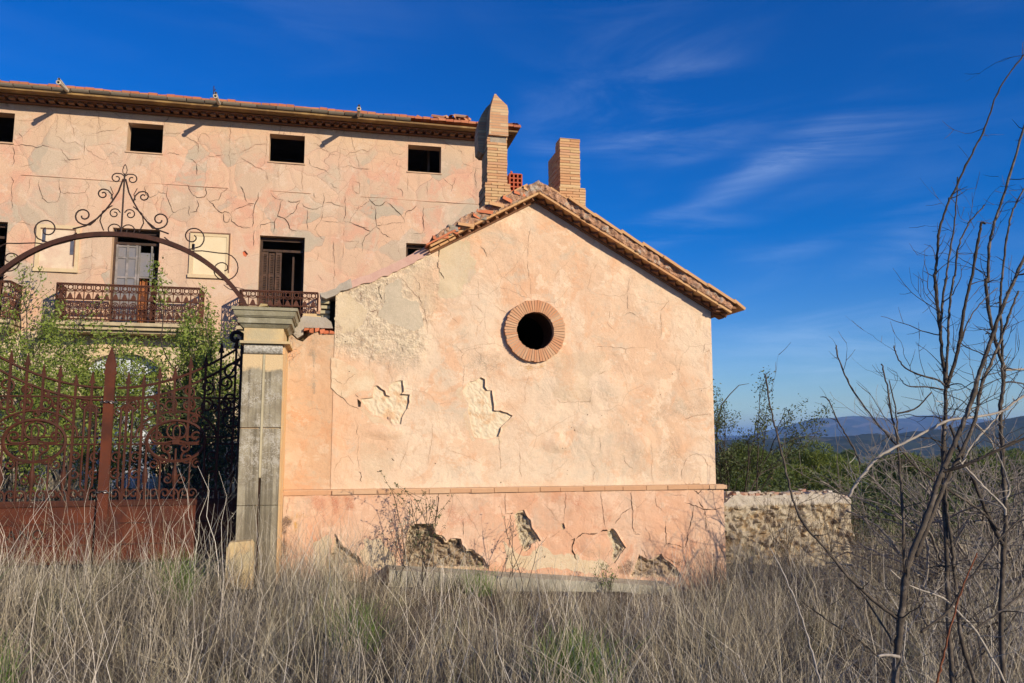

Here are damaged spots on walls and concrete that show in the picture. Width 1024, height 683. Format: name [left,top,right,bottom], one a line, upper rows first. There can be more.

crack [11,120,118,225]
crack [140,120,506,482]
peeling [334,293,367,334]
flaking render [330,358,412,431]
flaking render [456,376,514,446]
crack [392,432,719,563]
flaking render [313,521,488,571]
peeling [502,509,627,575]
flaking render [630,552,681,577]